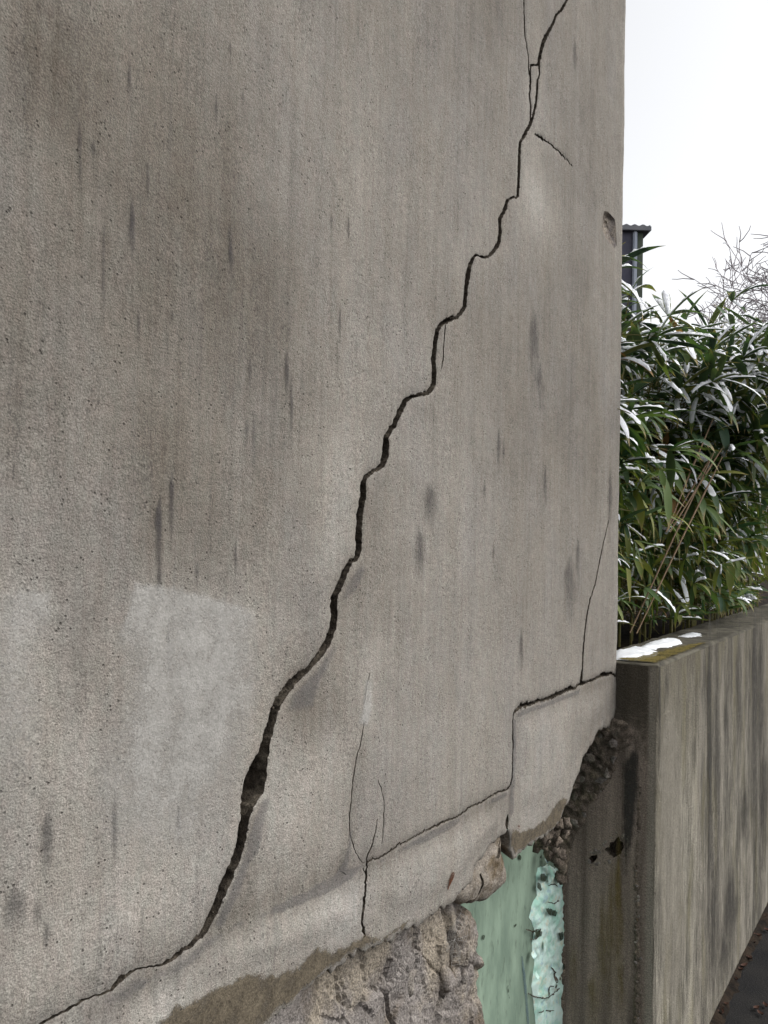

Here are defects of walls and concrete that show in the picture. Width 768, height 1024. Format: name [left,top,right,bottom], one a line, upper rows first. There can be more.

spalling [602,211,617,248]
crack [39,0,572,1024]
crack [340,523,615,937]
damp [160,920,417,1024]
spalling [270,836,506,1024]
peeling [526,718,642,1024]
damp [599,751,638,973]